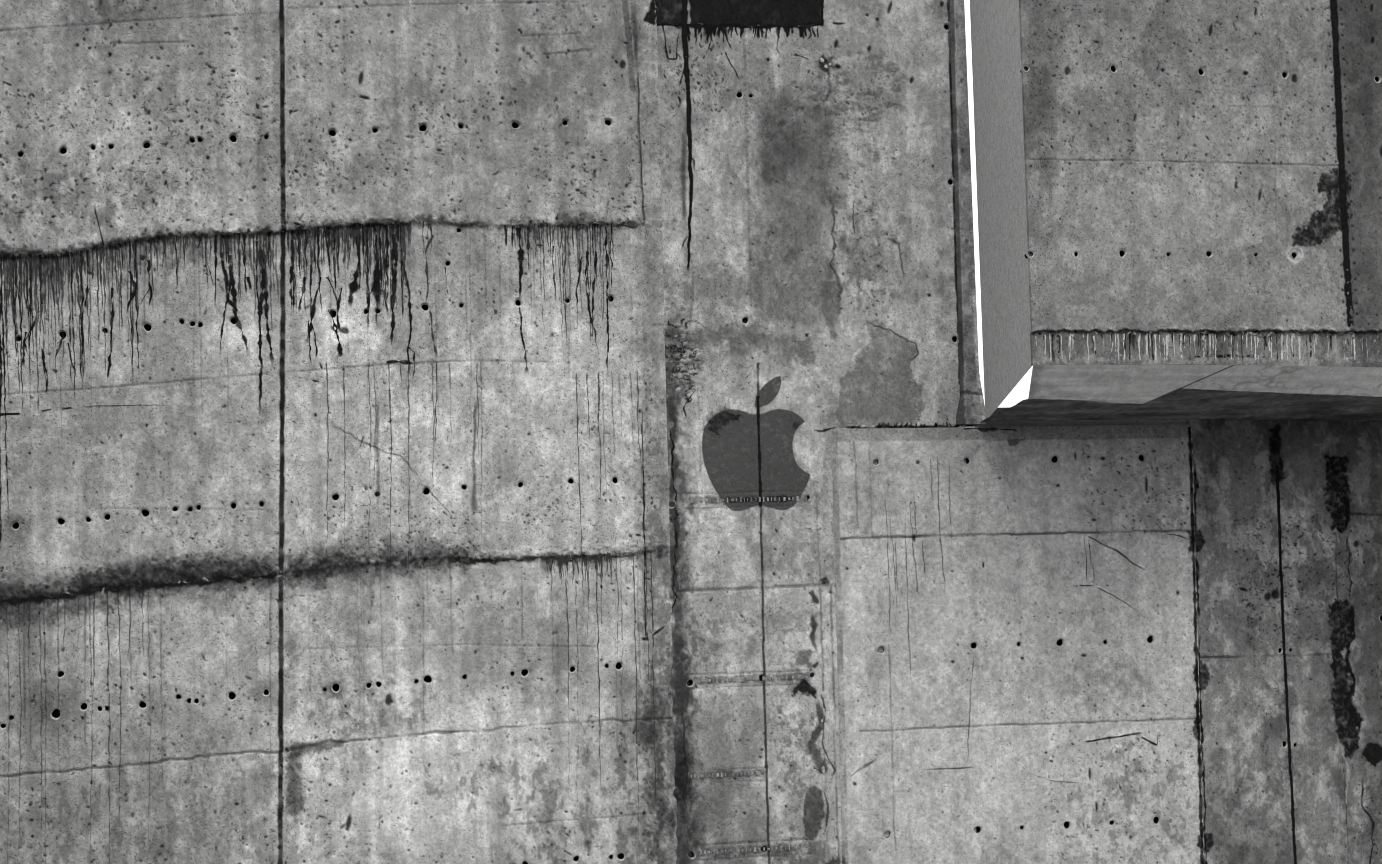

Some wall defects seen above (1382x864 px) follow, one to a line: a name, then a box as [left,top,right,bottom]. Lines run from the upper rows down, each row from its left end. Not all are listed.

water stain [0,215,656,841]